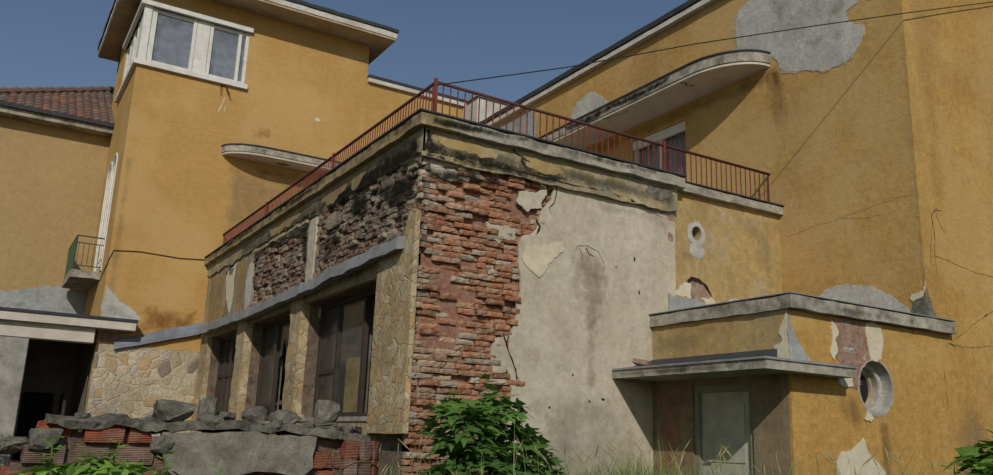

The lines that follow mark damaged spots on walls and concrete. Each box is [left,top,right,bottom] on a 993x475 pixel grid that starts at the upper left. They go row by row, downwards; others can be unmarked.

flaking render [734,0,866,75]
flaking render [571,91,607,119]
water stain [336,133,566,215]
crack [536,187,557,235]
crack [930,208,991,277]
flaking render [101,285,141,324]
flaking render [226,137,675,475]
flaking render [676,277,716,304]
flaking render [819,284,937,317]
flaking render [97,330,127,343]
flaking render [830,320,883,389]
flaking render [836,437,886,475]